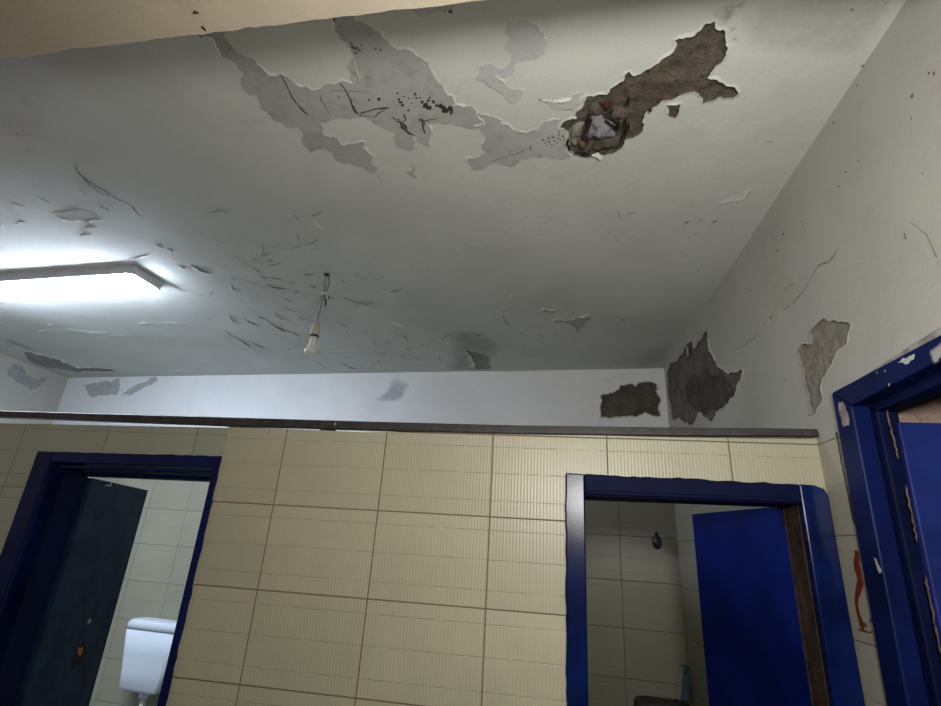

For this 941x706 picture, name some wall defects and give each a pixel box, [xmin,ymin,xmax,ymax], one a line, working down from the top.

peeling [196,16,742,182]
crack [76,168,140,216]
peeling [6,351,158,397]
peeling [464,350,492,370]
spalling [599,330,744,427]
spalling [797,317,852,417]
peeling [931,344,941,362]
peeling [838,401,850,427]
corrosion [854,550,873,633]